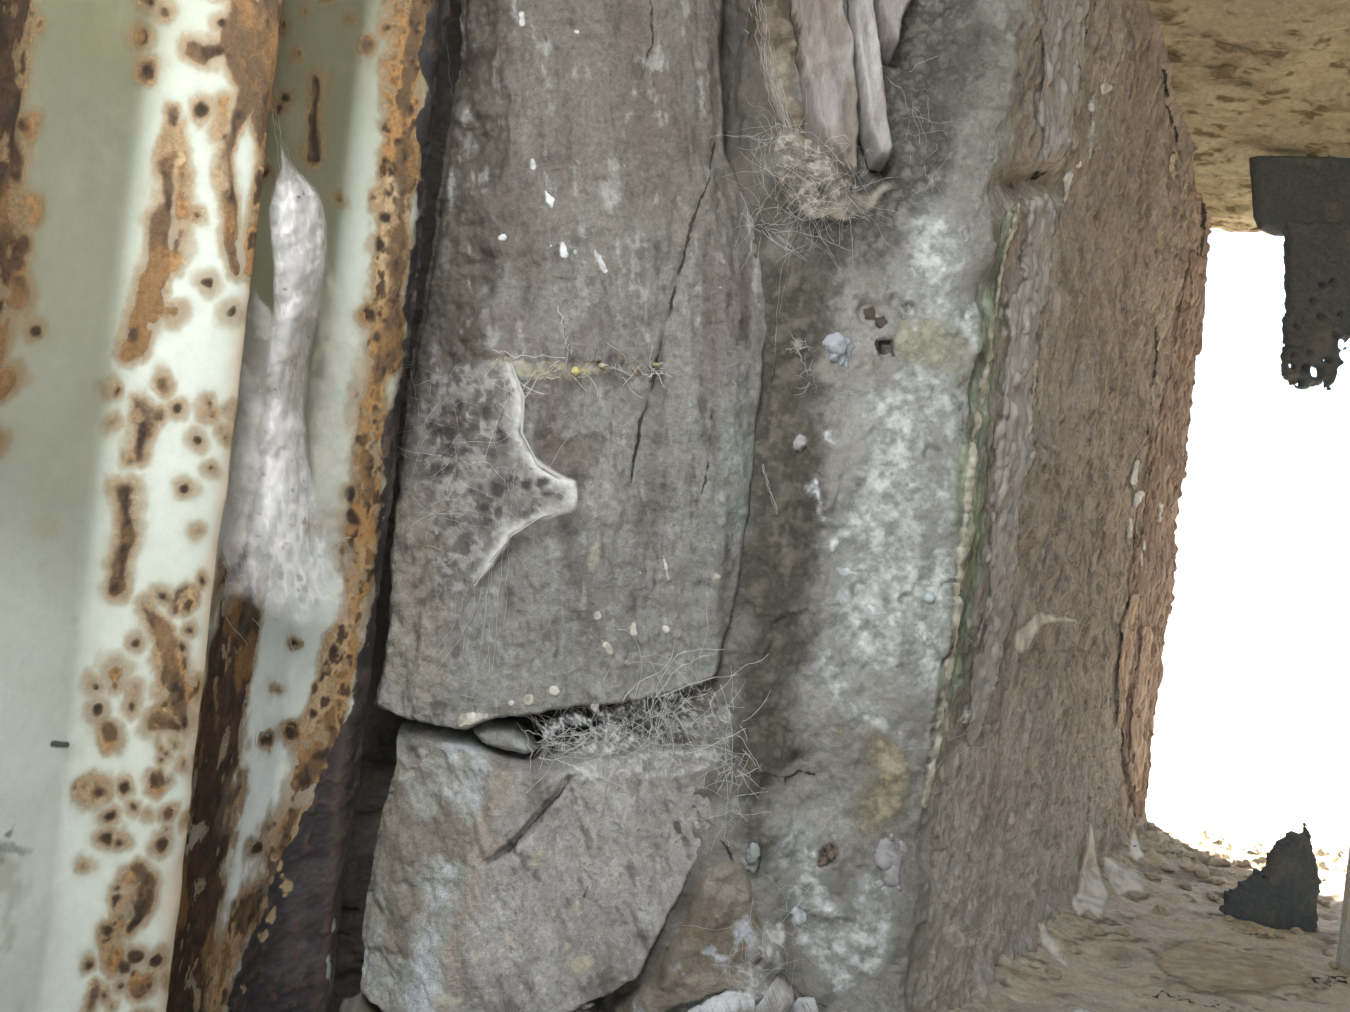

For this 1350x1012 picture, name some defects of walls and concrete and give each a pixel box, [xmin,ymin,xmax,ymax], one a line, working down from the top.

rust [0,0,44,403]
crack [669,143,715,311]
crack [631,348,661,482]
rust [71,0,433,1012]
crack [507,778,570,852]